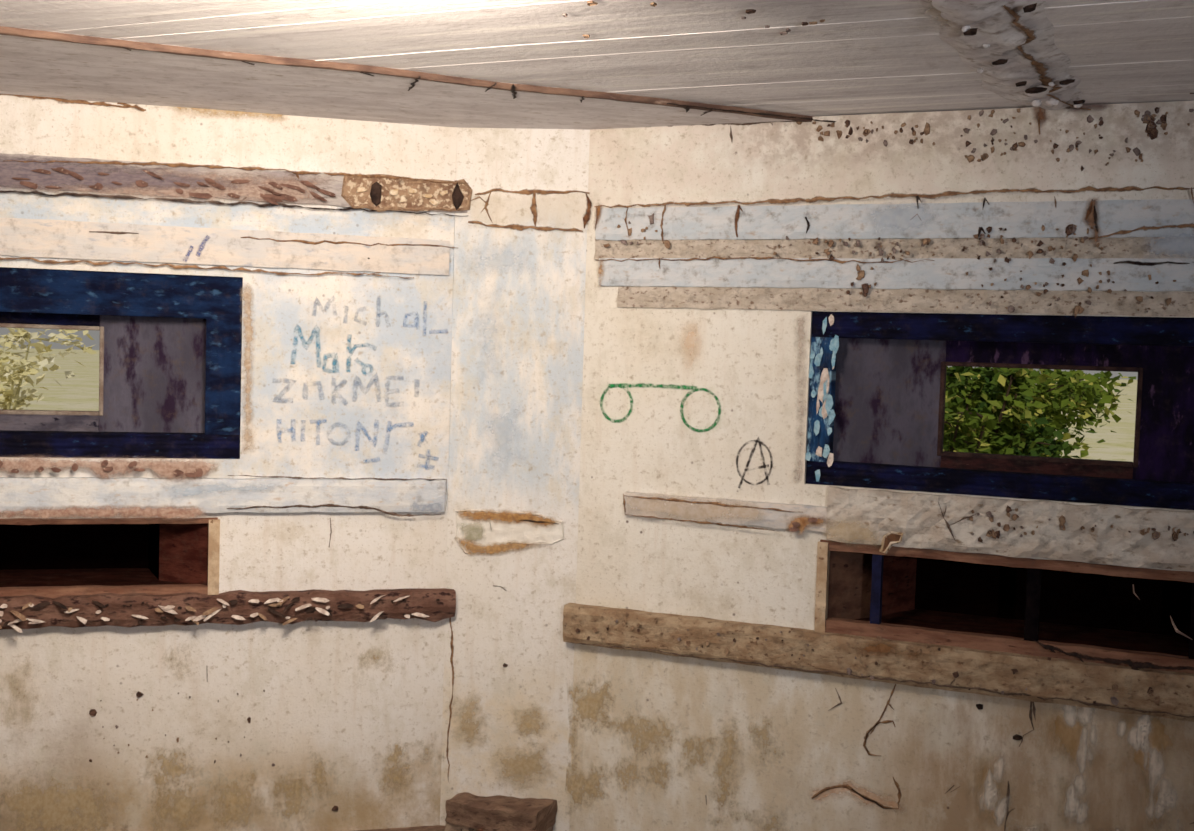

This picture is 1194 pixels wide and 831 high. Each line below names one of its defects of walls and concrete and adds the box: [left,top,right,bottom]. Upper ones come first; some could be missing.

rust [1035,107,1046,135]
crack [594,186,1194,268]
spalling [455,509,564,554]
peeling [0,600,110,633]
peeling [123,595,430,625]
damp [5,780,106,831]
damp [154,752,255,831]
damp [502,752,545,783]
damp [566,684,737,806]
crack [570,639,1194,809]